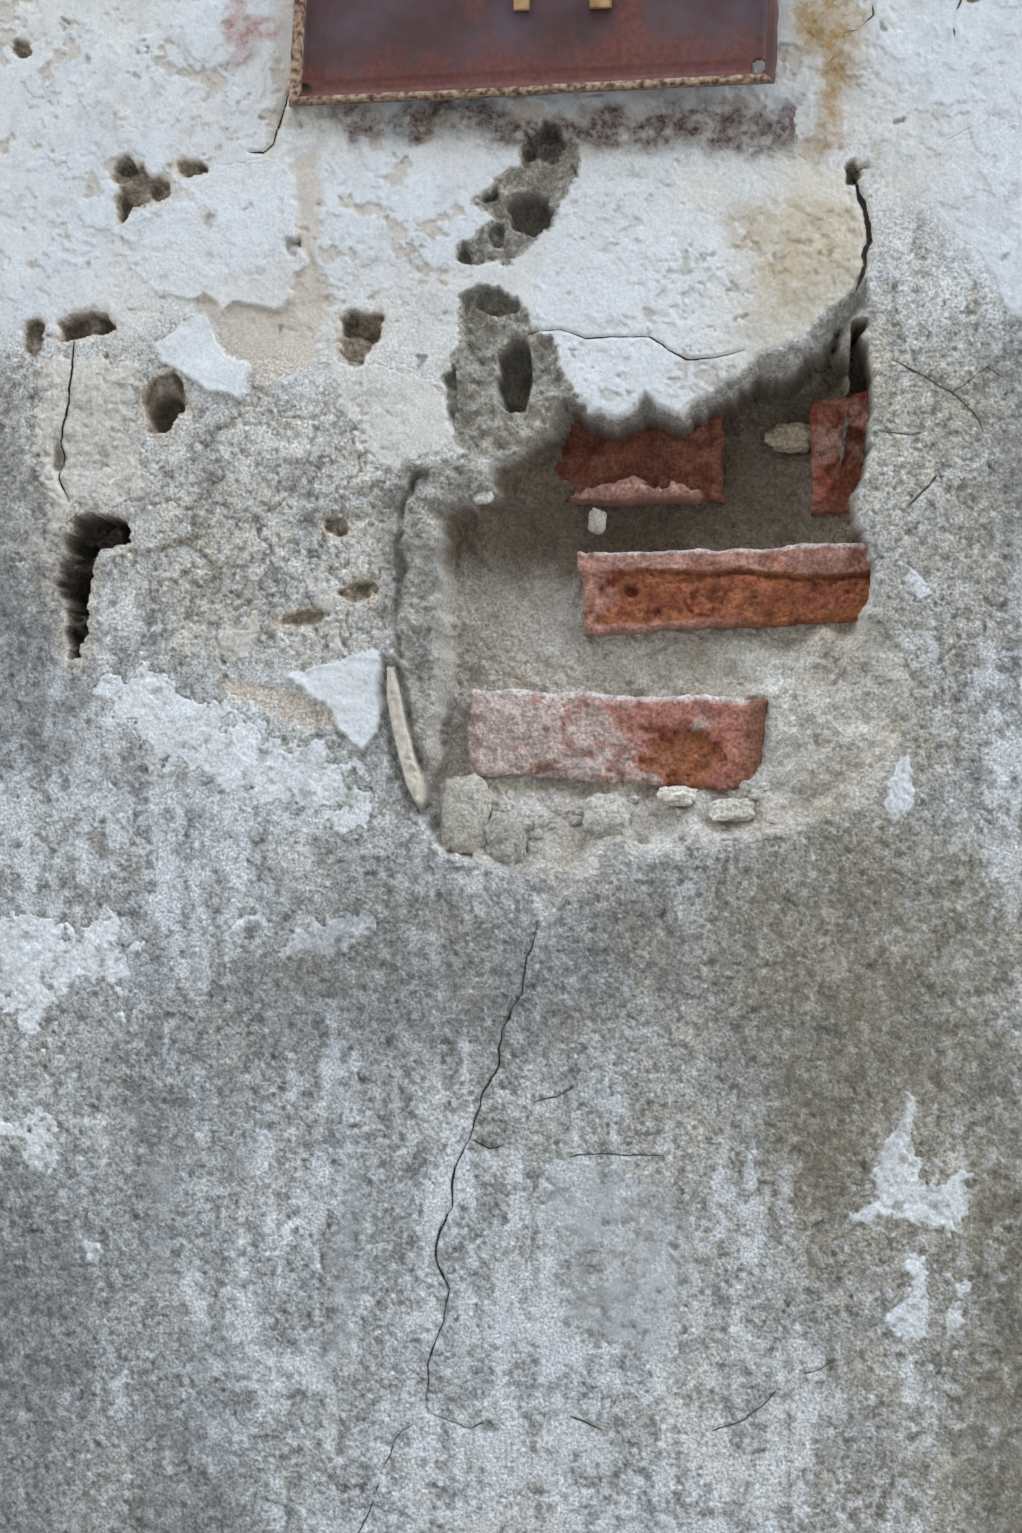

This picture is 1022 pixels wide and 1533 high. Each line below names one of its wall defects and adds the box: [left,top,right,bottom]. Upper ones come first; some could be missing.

peeling [118,157,308,402]
crack [58,339,75,502]
peeling [26,354,152,568]
spalling [93,281,915,909]
crack [358,923,538,1533]
peeling [848,1093,978,1239]
peeling [883,1250,972,1357]
crack [539,1413,633,1433]
crack [683,1360,838,1434]